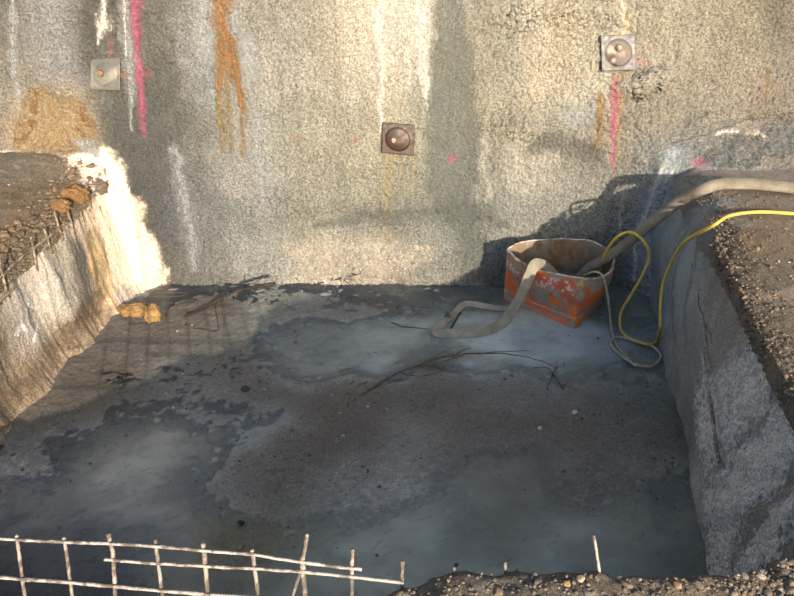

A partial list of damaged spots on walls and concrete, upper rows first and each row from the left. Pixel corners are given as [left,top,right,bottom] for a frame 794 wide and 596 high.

rust [211,0,247,158]
crack [656,112,794,147]
spalling [0,168,109,349]
crack [698,289,712,360]